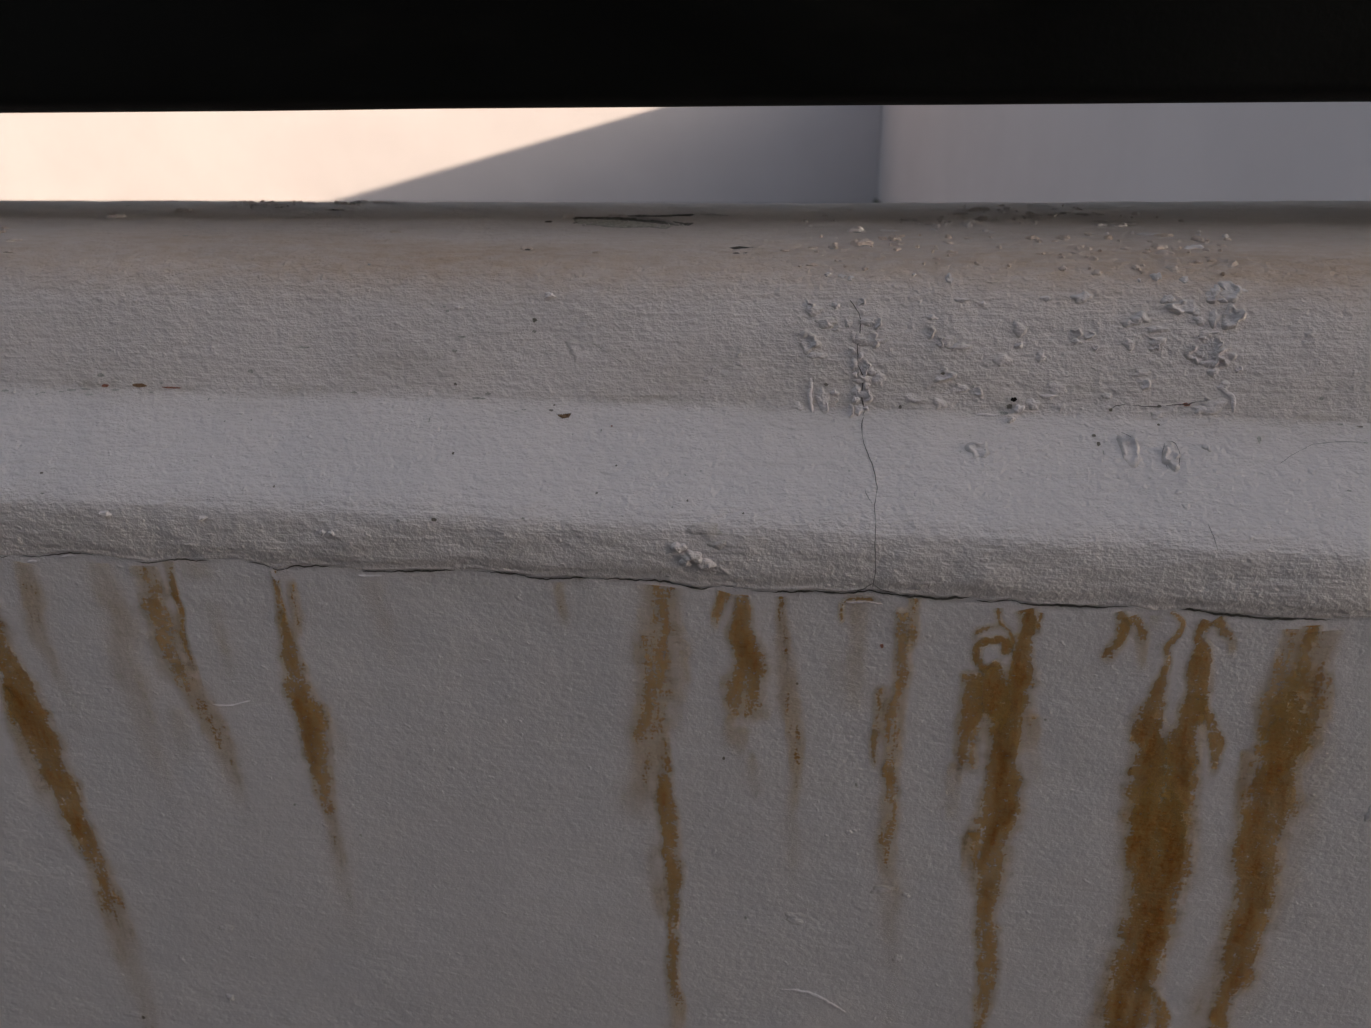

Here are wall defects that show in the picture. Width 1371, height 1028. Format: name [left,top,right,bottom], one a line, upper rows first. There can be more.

spalling [545,213,731,229]
crack [2,300,1367,621]
peeling [975,397,1025,424]
rust [0,621,125,920]
rust [140,567,225,747]
rust [273,571,334,815]
rust [633,585,682,1006]
rust [712,591,767,717]
rust [870,598,918,863]
rust [957,608,1043,1028]
rust [1102,611,1233,1028]
rust [1209,625,1332,1028]